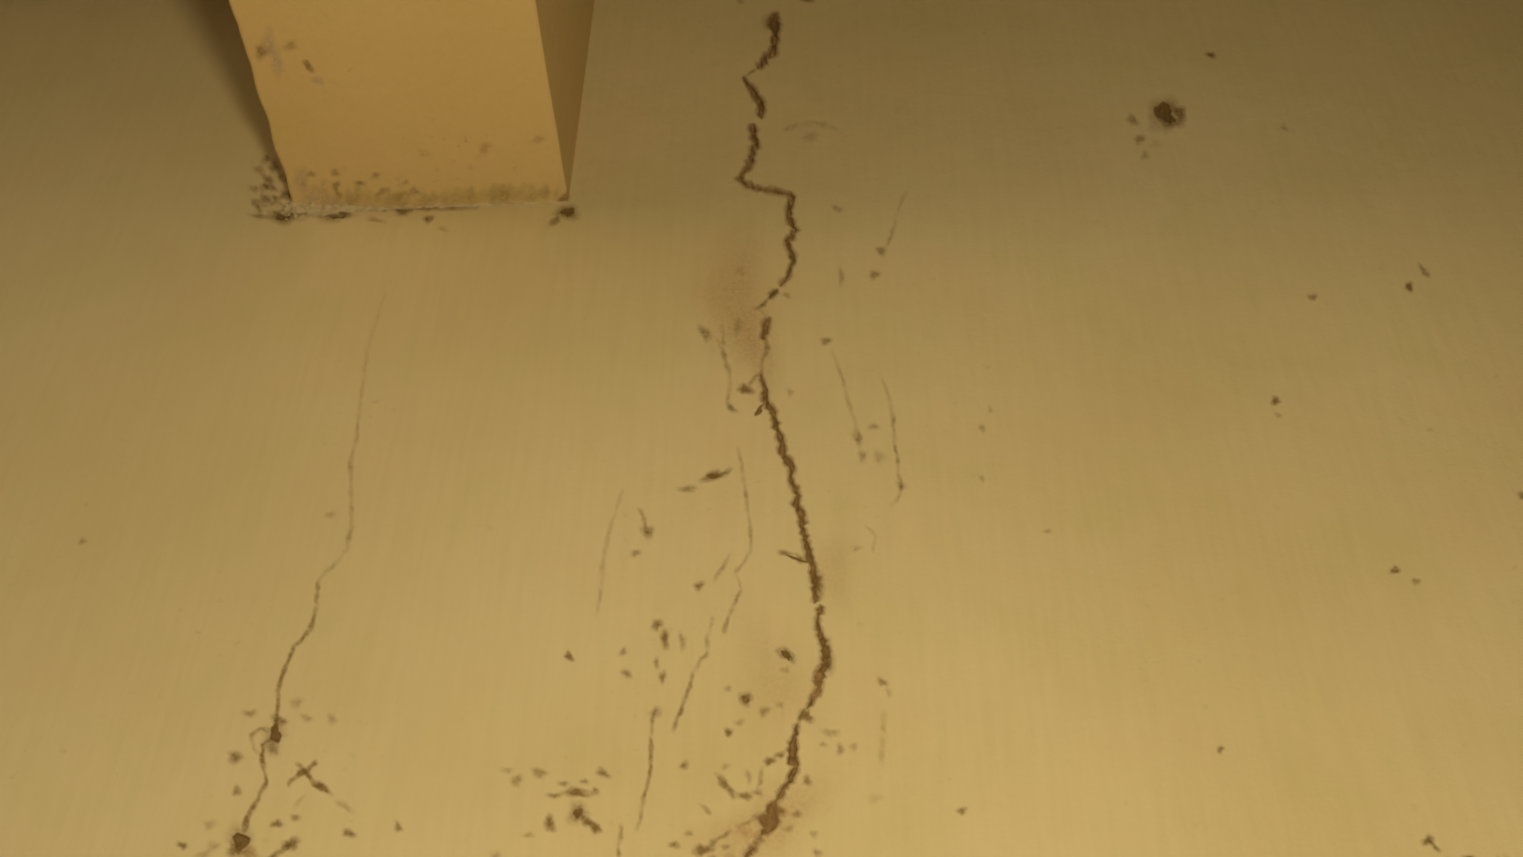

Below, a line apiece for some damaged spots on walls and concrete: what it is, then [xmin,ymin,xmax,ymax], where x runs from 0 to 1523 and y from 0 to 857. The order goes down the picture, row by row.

flaking render [275,178,574,221]
crack [735,0,830,857]
crack [243,618,314,825]